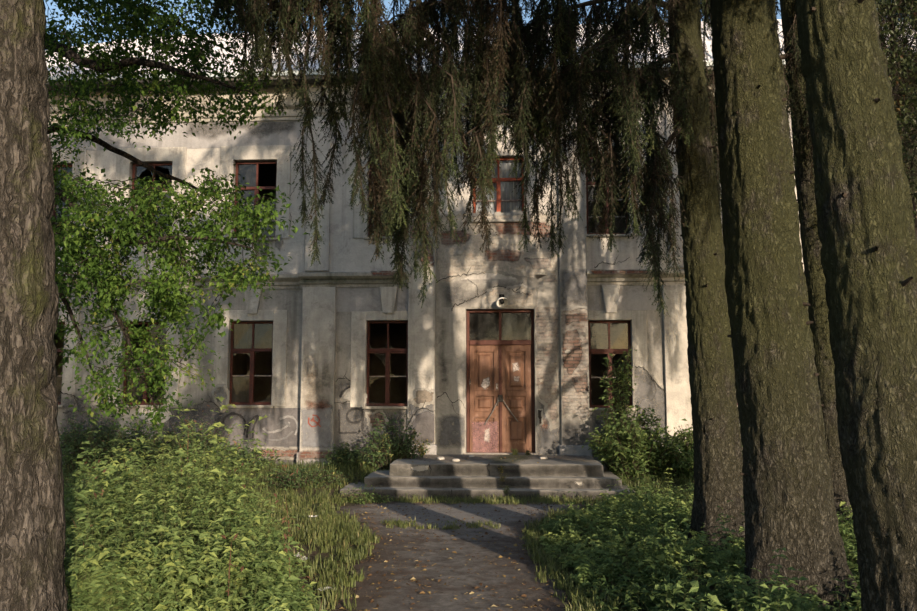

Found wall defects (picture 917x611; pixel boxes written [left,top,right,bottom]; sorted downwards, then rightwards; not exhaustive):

crack [436,266,528,311]
flaking render [409,210,589,454]
crack [408,392,465,424]
flaking render [632,368,666,448]